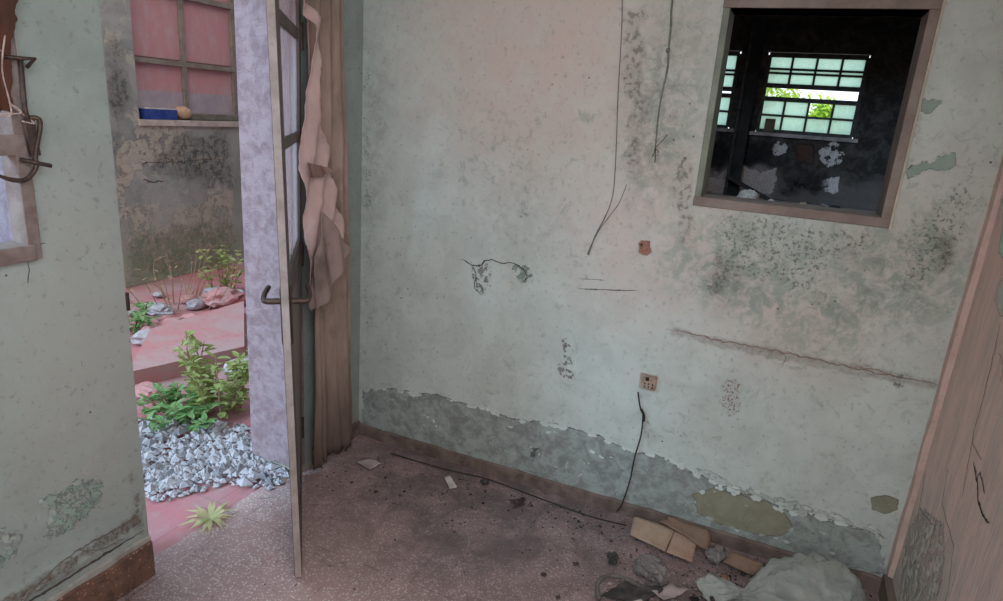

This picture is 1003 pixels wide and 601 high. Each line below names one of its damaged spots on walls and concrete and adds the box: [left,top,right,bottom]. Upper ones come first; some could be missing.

peeling [919,97,943,115]
peeling [905,151,956,178]
peeling [470,262,492,296]
peeling [512,264,532,284]
water stain [724,219,866,287]
crack [669,329,937,385]
peeling [38,476,104,539]
flaking render [362,388,889,574]
flaking render [871,495,898,514]
crack [905,325,1003,601]
peeling [898,507,945,601]